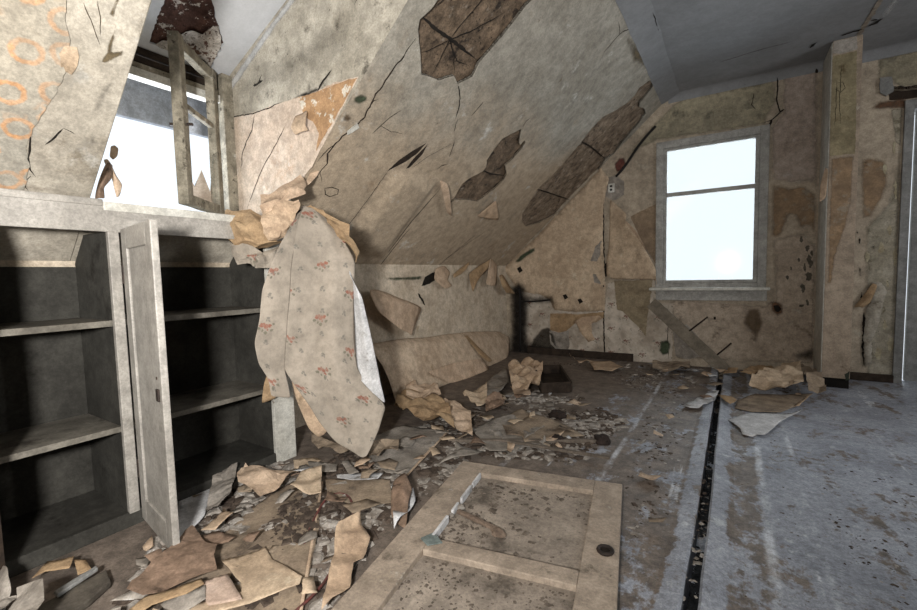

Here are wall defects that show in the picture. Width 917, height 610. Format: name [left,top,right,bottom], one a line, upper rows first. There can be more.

spalling [150,0,223,67]
spalling [414,0,536,88]
peeling [298,78,357,151]
crack [318,38,416,197]
spalling [450,126,528,204]
spalling [520,79,654,228]
peeling [640,82,775,147]
crack [751,78,784,125]
crack [834,68,845,124]
peeling [828,36,898,375]
peeling [672,186,815,362]
water stain [745,310,762,336]